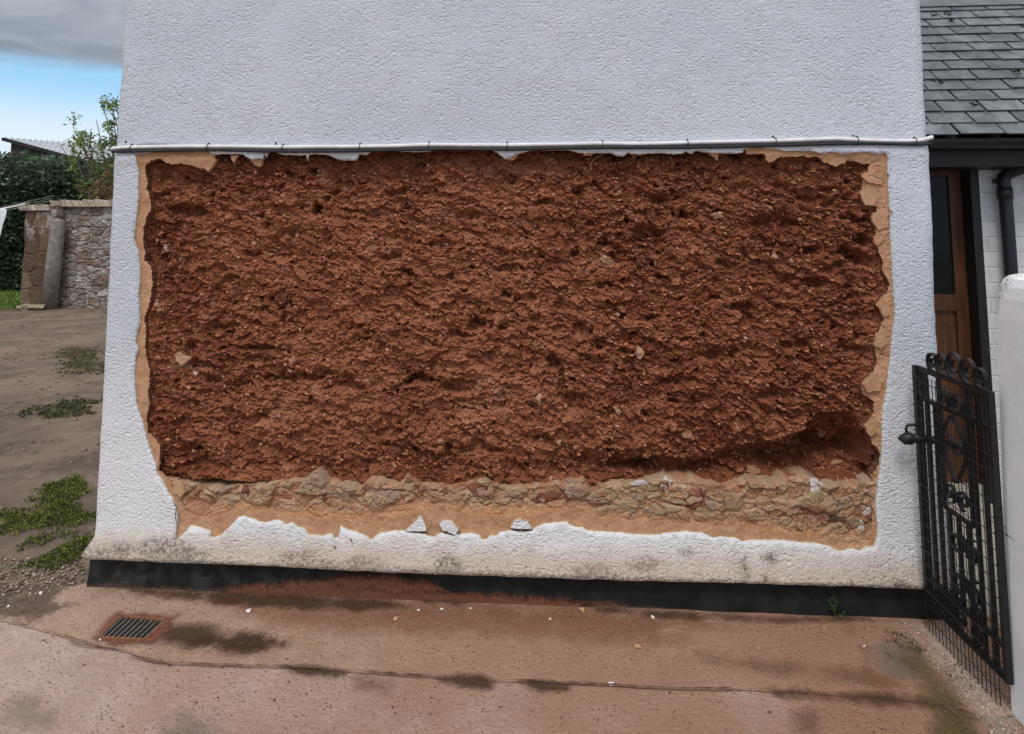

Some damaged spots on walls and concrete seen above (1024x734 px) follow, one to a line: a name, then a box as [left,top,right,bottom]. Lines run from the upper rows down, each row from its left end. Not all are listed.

spalling [135,147,894,550]